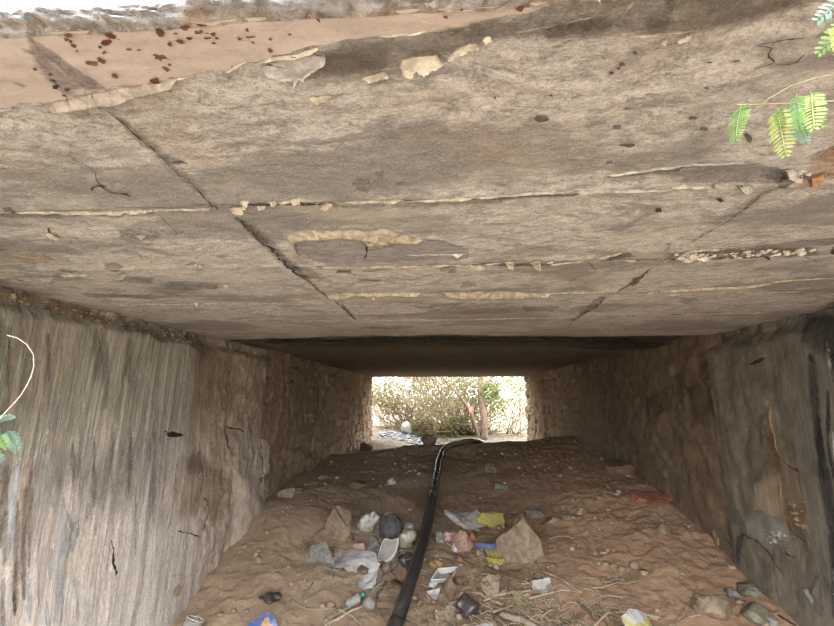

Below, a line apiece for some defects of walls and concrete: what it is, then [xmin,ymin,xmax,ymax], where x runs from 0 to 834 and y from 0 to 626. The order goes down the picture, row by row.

corrosion [85,32,119,66]
corrosion [155,24,219,47]
peeling [0,0,797,115]
crack [65,153,129,197]
crack [104,108,356,320]
peeling [230,162,827,215]
peeling [287,229,834,271]
leakage [809,355,834,603]
leakage [0,394,90,626]
crack [110,539,118,576]